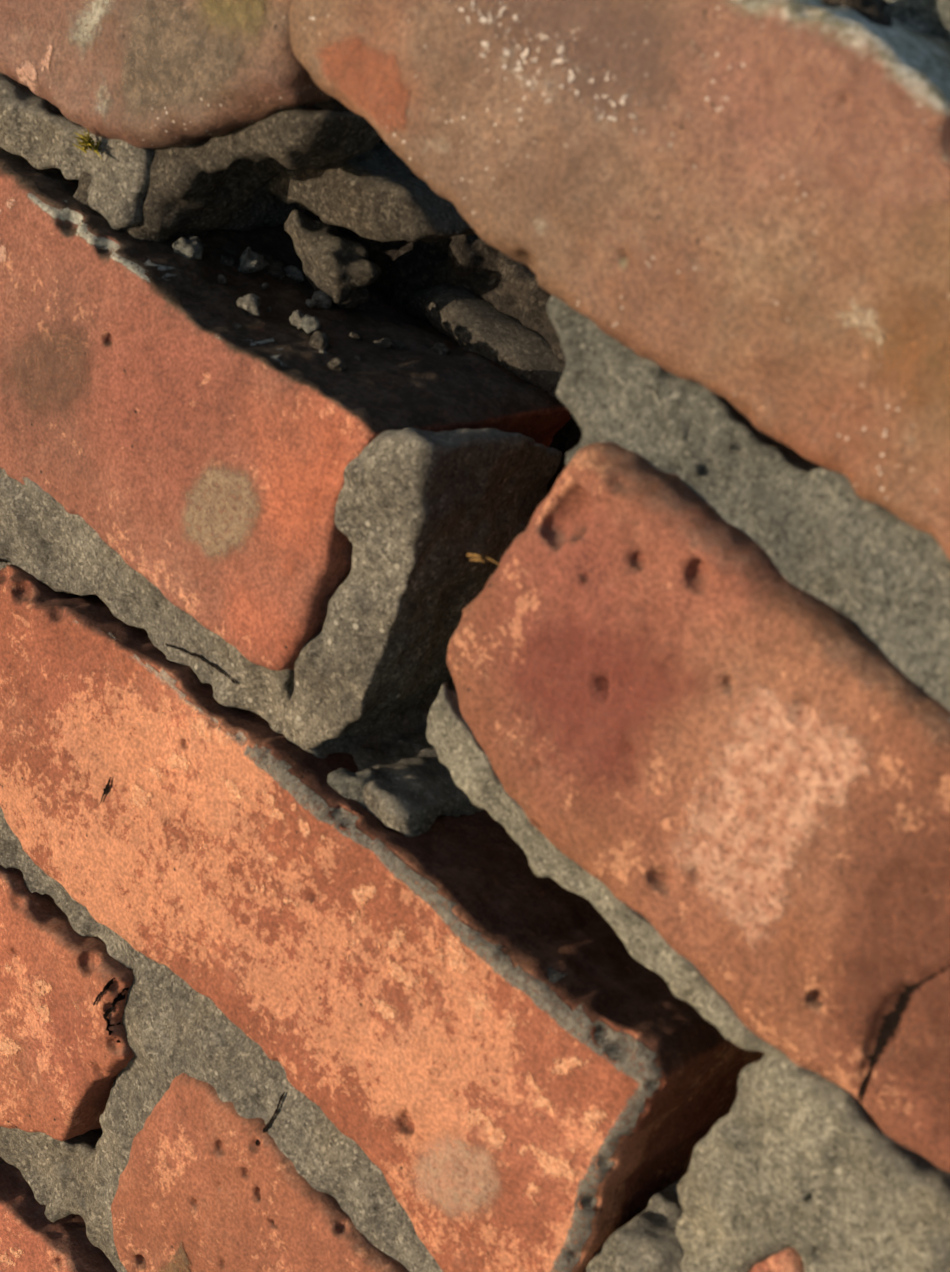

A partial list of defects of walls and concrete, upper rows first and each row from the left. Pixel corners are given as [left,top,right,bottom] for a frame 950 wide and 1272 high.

crack [93,967,132,1043]
crack [858,967,946,1107]